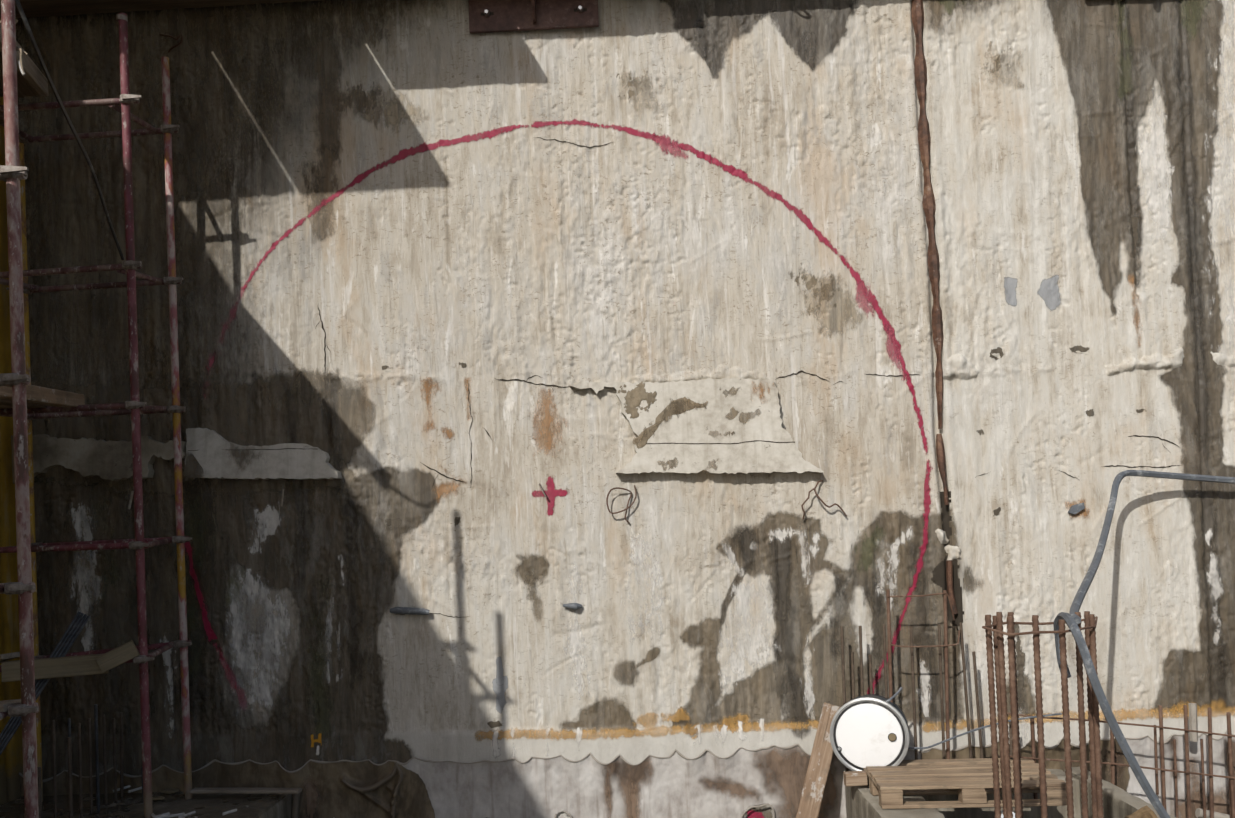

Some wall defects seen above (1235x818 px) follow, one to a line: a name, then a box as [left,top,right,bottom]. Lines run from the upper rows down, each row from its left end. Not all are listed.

damp [660,0,857,79]
damp [924,0,998,30]
damp [1047,0,1235,713]
peeling [32,428,342,483]
damp [15,0,439,818]
crack [420,375,569,488]
corrosion [534,390,562,452]
peeling [569,378,823,474]
damp [496,657,504,685]
damp [547,510,980,818]